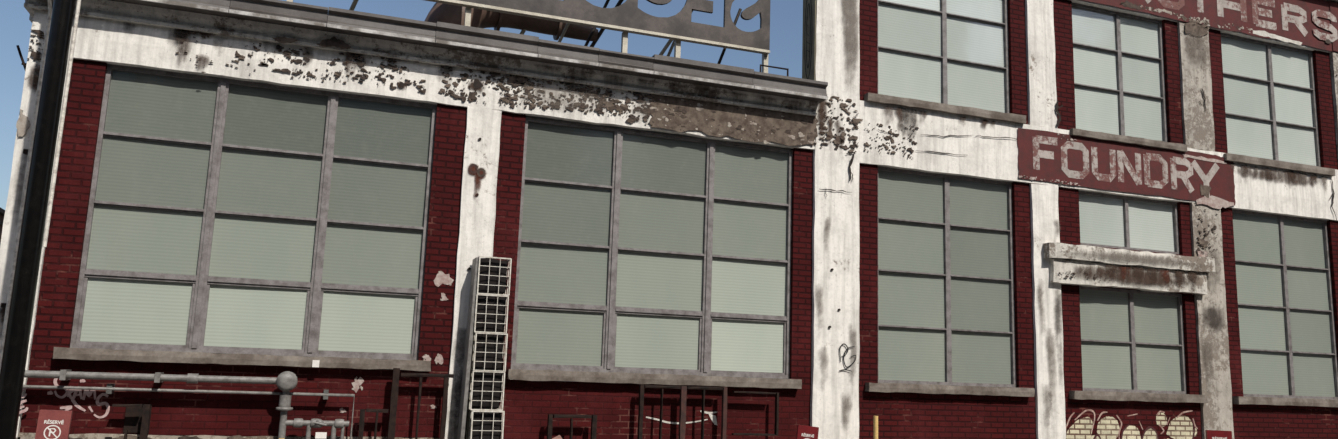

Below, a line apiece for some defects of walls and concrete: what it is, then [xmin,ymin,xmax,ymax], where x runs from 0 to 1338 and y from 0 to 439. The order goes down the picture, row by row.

peeling [27,30,44,90]
spalling [226,37,901,154]